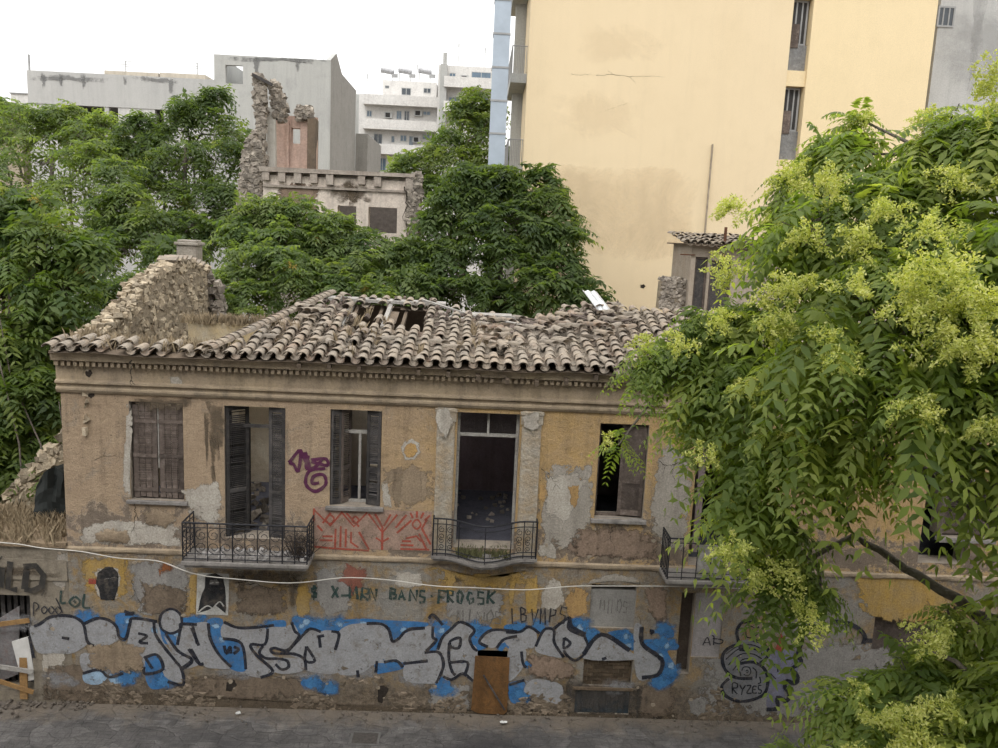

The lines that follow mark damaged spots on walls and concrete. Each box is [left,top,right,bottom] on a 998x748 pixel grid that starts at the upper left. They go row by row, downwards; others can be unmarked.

damp [41,75,91,87]
damp [204,401,225,481]
flaking render [181,481,222,527]
flaking render [381,481,392,508]
flaking render [538,445,692,560]
flaking render [78,519,181,601]
spalling [140,574,197,617]
flaking render [524,574,640,619]